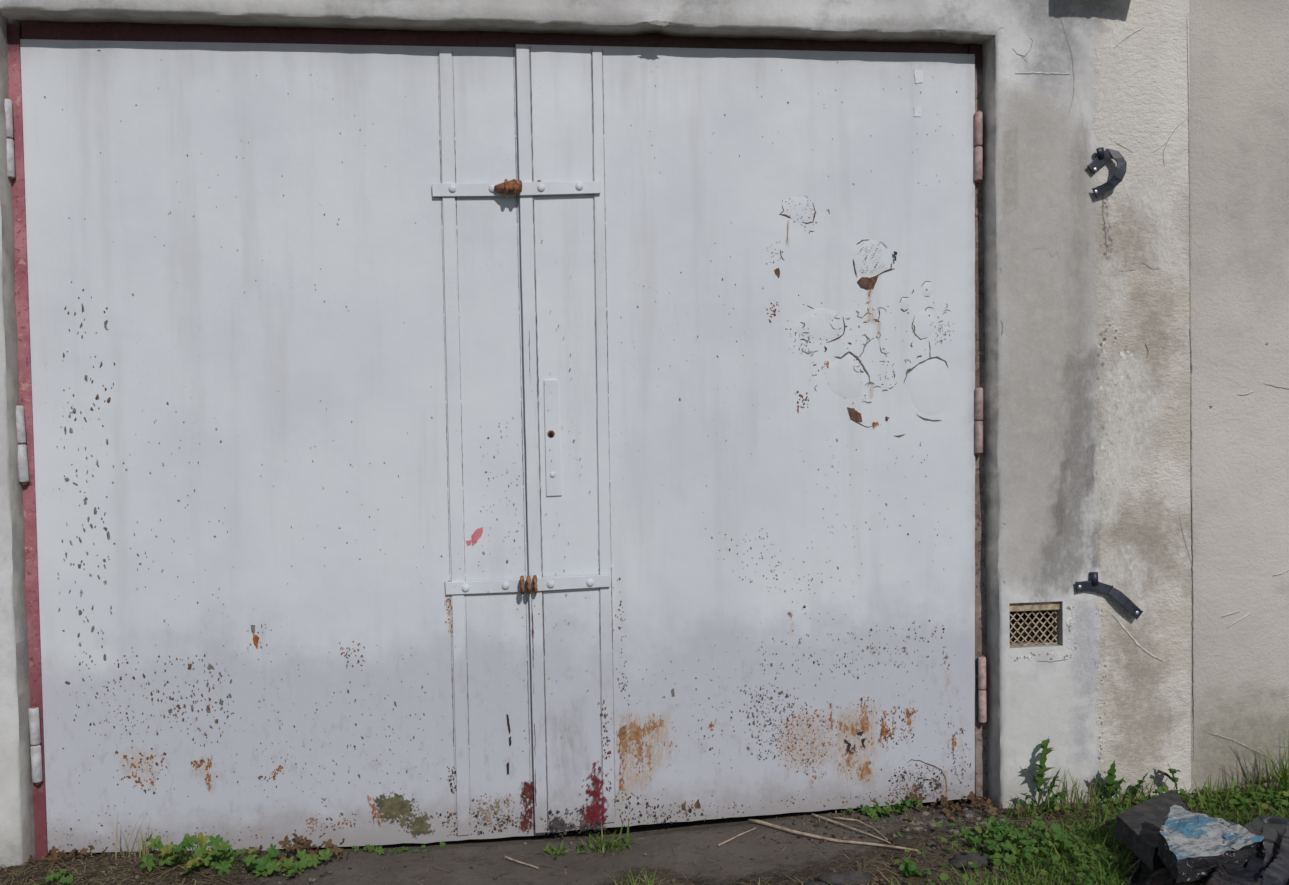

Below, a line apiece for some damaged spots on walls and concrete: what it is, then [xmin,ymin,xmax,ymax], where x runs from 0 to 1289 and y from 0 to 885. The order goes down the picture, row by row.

peeling [766,294,926,428]
water stain [999,99,1099,592]
corrosion [115,747,167,794]
corrosion [191,758,212,789]
corrosion [579,761,608,828]
corrosion [617,713,671,791]
corrosion [780,696,918,788]